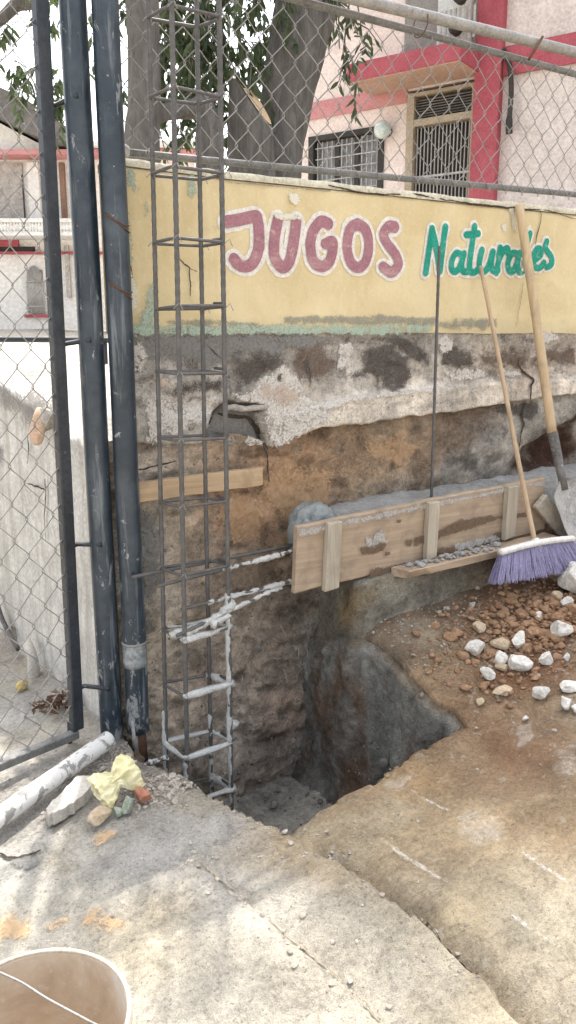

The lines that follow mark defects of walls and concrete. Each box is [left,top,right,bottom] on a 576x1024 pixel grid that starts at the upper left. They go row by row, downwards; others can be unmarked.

flaking render [130,233,486,498]
water stain [134,314,497,396]
water stain [350,337,526,393]
crack [518,359,535,447]
water stain [546,345,576,365]